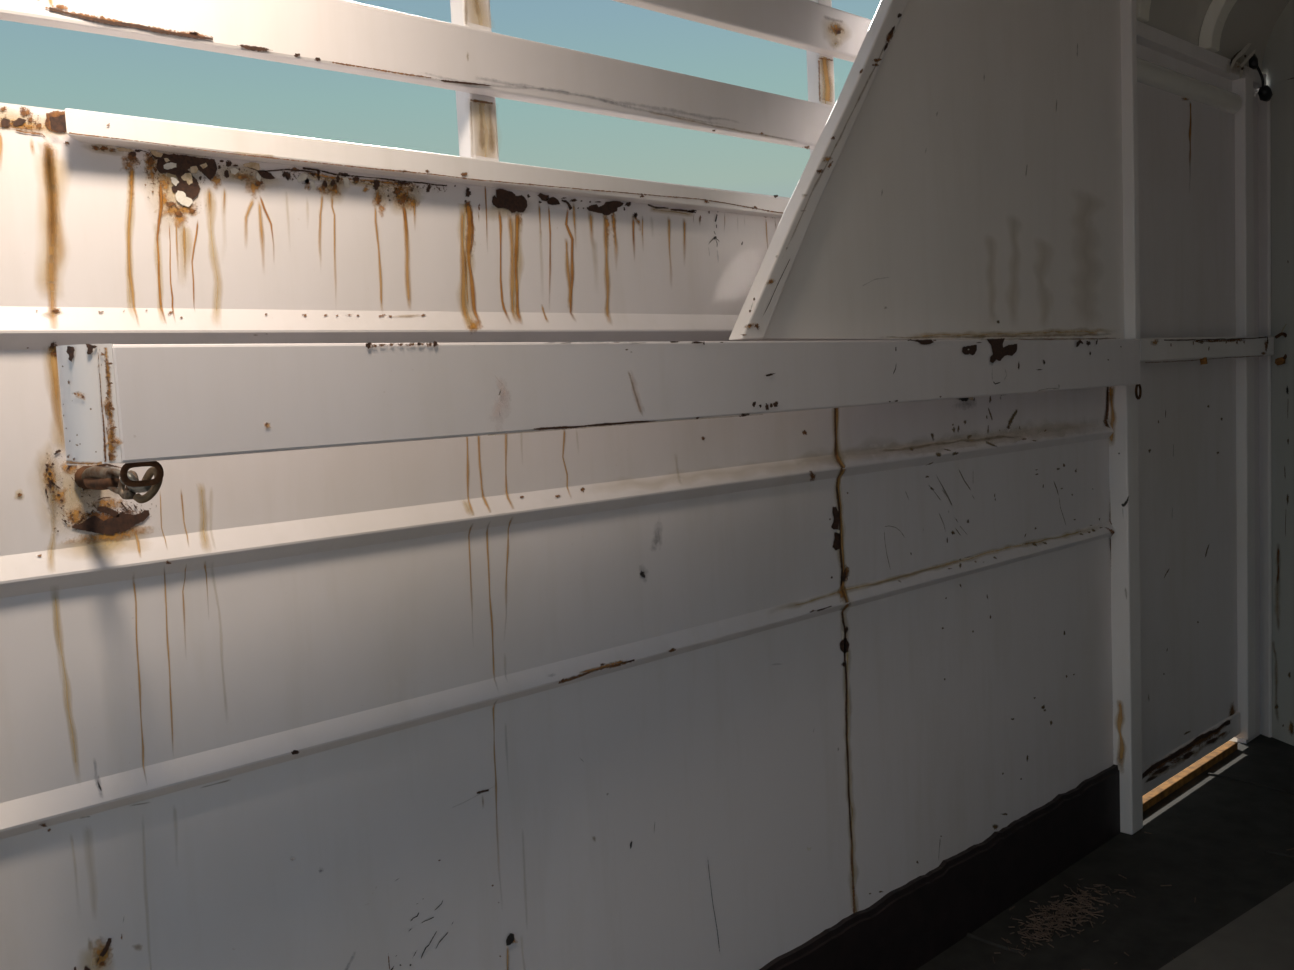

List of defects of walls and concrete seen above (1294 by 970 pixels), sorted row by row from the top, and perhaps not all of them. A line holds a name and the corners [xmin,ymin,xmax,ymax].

rust [45,0,213,40]
rust [237,44,269,52]
rust [294,53,493,145]
rust [856,13,902,104]
rust [0,106,783,330]
peeling [492,189,631,319]
peeling [962,321,1020,368]
rust [45,342,166,553]
rust [467,436,489,510]
rust [133,582,144,768]
rust [164,561,186,741]
rust [468,528,494,673]